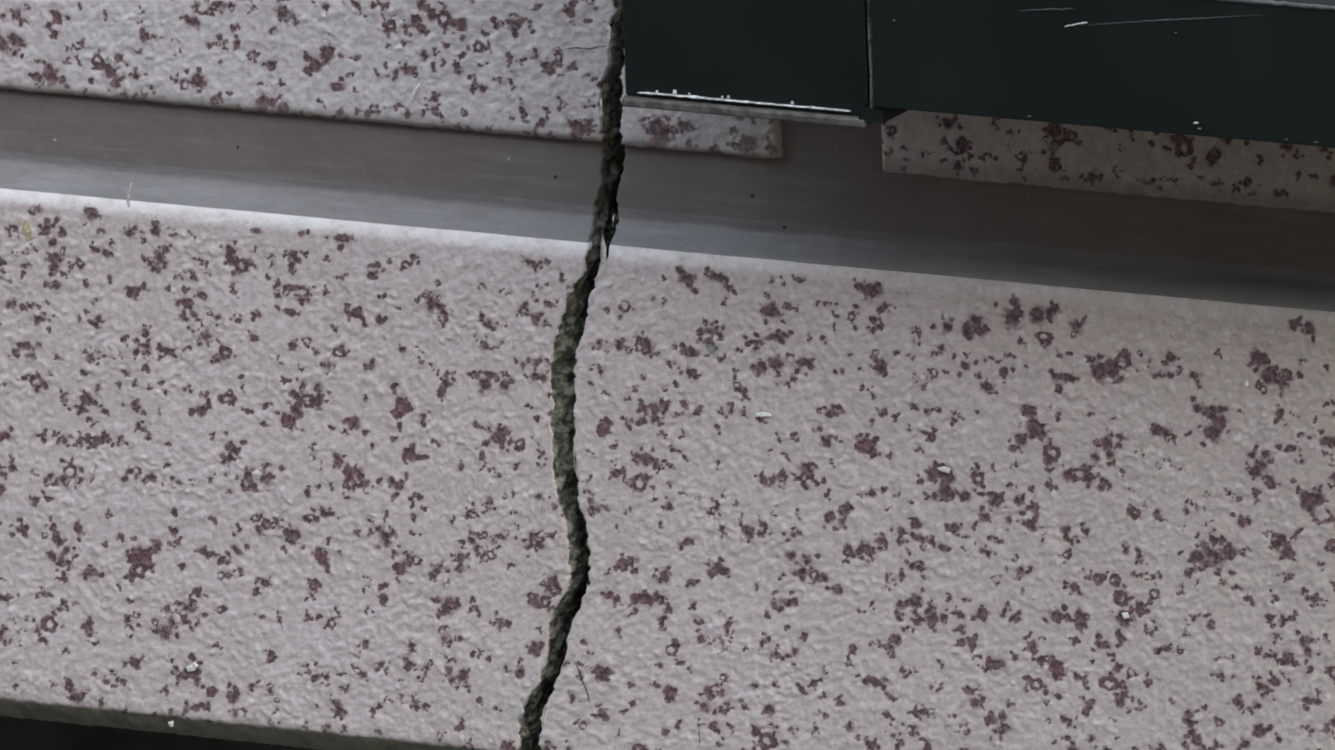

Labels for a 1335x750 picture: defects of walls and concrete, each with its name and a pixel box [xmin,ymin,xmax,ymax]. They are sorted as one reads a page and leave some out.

crack [518,0,626,750]